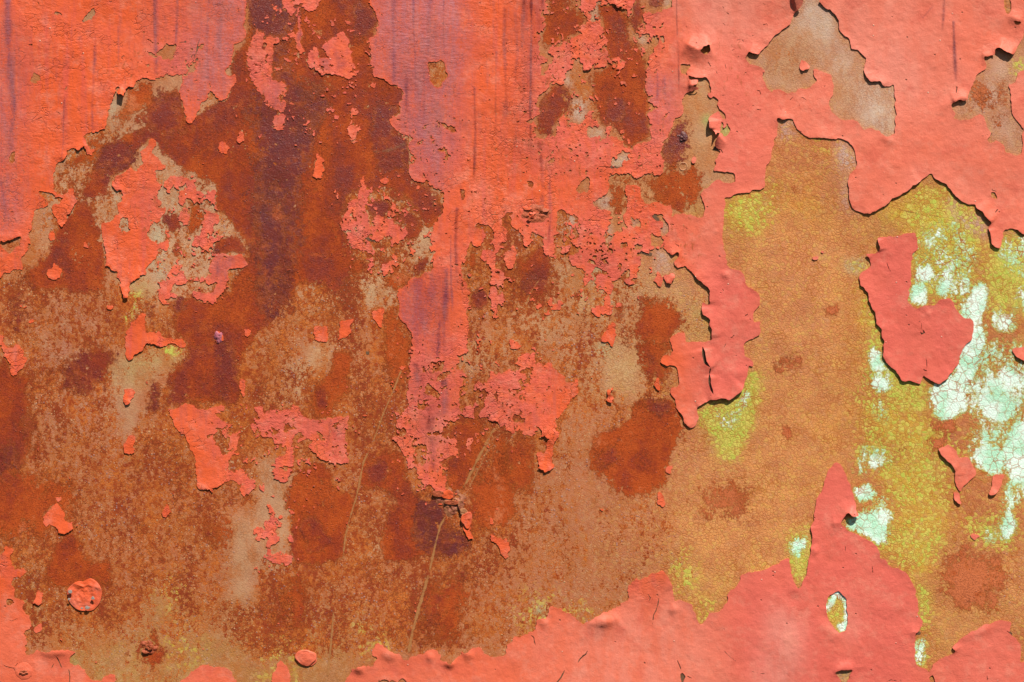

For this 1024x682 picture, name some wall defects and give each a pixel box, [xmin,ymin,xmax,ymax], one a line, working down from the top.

peeling [46,263,62,280]
rust [2,0,443,419]
peeling [217,0,404,191]
rust [543,0,664,148]
rust [605,119,705,220]
peeling [746,0,897,137]
peeling [951,0,1024,156]
rust [587,293,689,499]
rust [0,357,113,592]
rust [357,417,544,652]
peeling [826,591,848,633]
peeling [836,670,852,682]